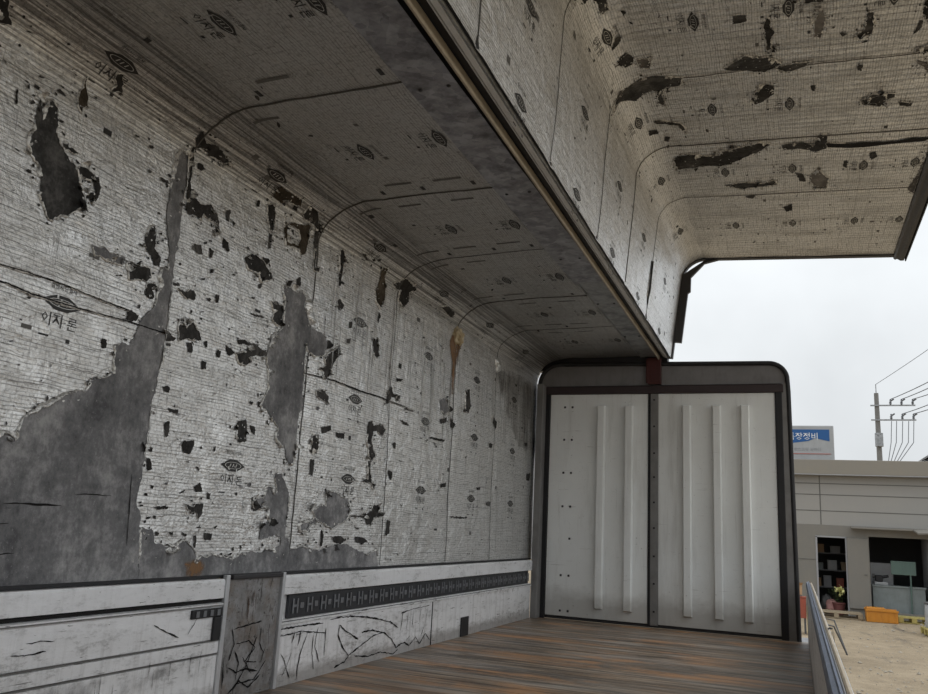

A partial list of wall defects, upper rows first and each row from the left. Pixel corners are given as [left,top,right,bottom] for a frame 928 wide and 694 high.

peeling [0,0,25,26]
peeling [572,0,612,20]
peeling [913,1,928,34]
peeling [15,84,112,231]
peeling [72,77,97,118]
peeling [611,37,691,116]
peeling [649,119,688,142]
peeling [672,134,833,174]
peeling [723,16,813,105]
peeling [0,127,390,586]
corrosion [450,326,465,394]
crack [280,605,430,679]